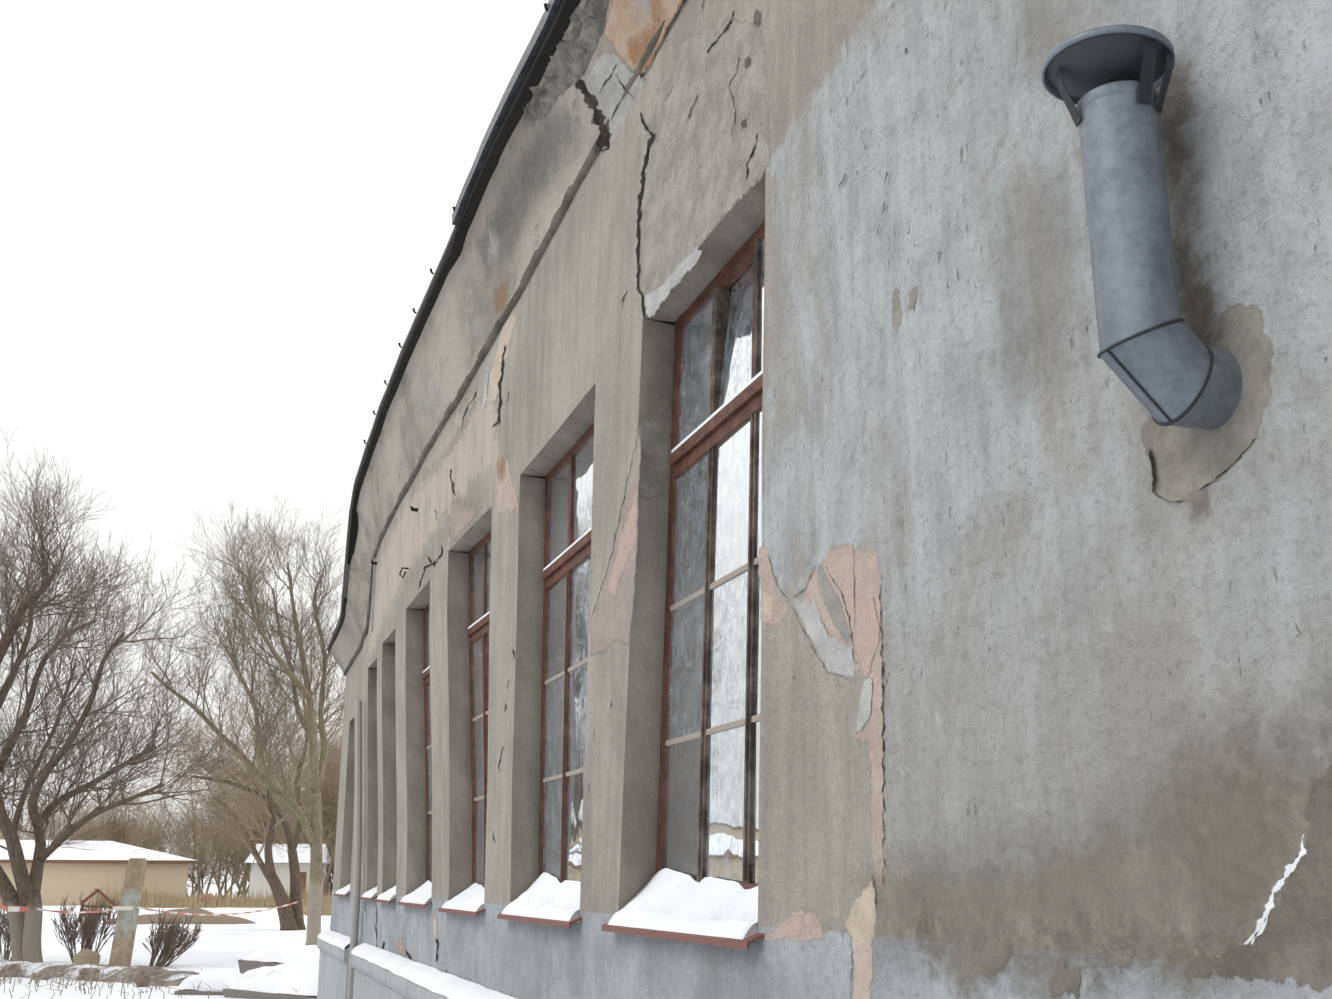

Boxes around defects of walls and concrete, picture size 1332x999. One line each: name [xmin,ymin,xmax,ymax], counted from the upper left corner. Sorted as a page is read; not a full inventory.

crack [575,80,612,152]
flaking render [521,0,771,317]
crack [418,544,443,589]
peeling [590,358,674,654]
flaking render [1141,303,1273,518]
peeling [758,544,888,999]
peeling [930,931,1088,998]
flaking render [1104,762,1332,992]